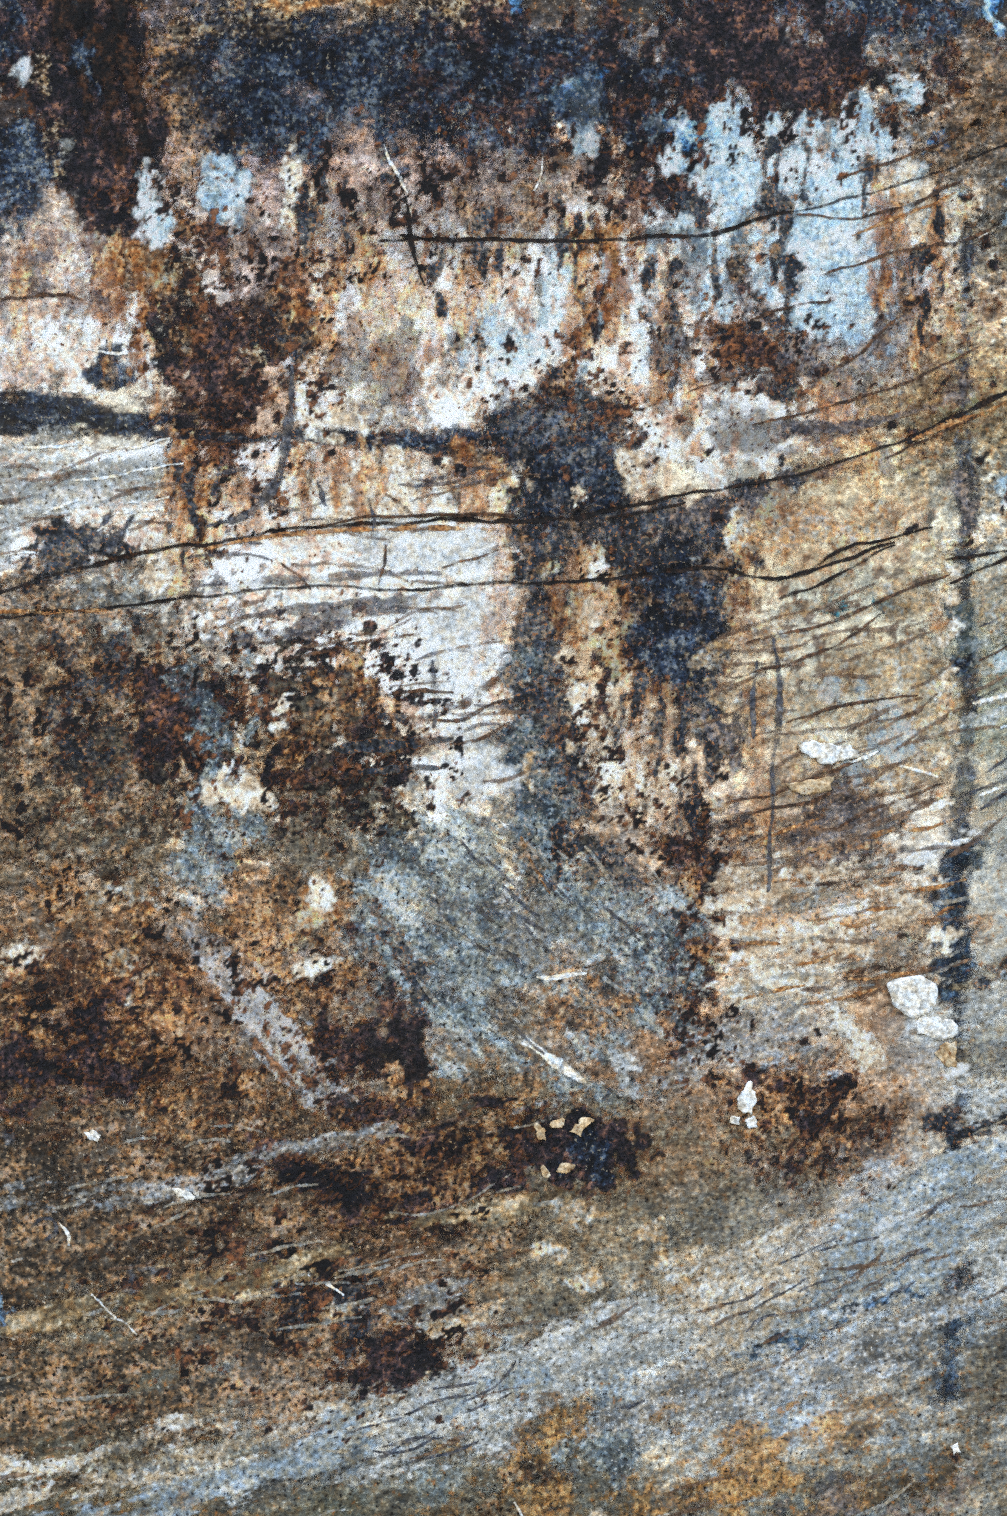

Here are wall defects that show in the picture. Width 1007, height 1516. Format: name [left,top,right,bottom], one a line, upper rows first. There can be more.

crack [1,292,103,304]
crack [752,346,980,426]
corrosion [0,0,1007,1206]
crack [0,391,1007,1005]
corrosion [0,510,626,1444]
crack [389,835,665,1057]
crack [53,1124,260,1209]
crack [82,1184,441,1330]
crack [318,1166,1007,1463]
crack [56,1394,124,1402]
corrosion [436,1392,588,1516]
corrosion [625,1397,895,1516]